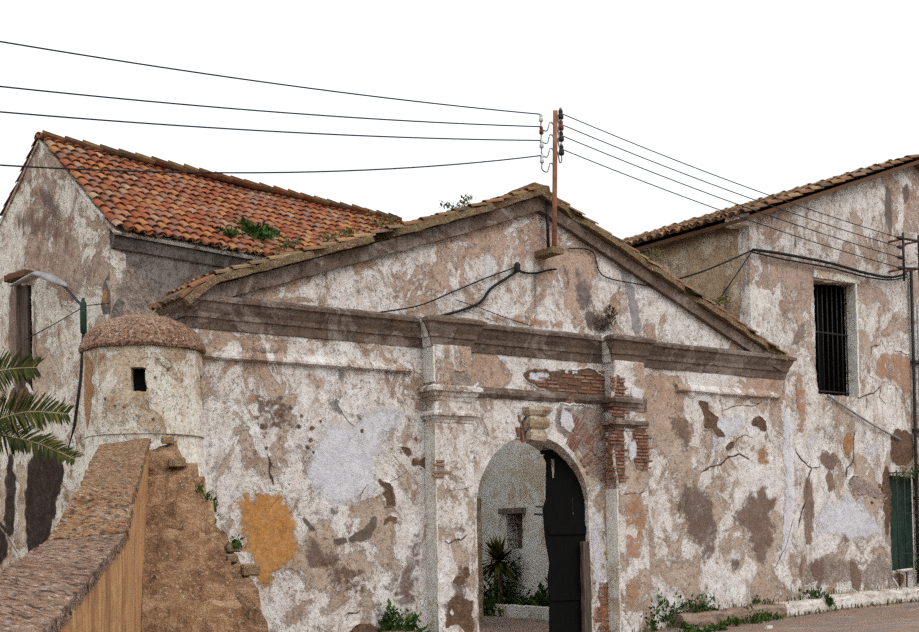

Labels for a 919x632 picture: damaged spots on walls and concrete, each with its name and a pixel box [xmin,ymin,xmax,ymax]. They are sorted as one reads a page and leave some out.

peeling [247,389,402,525]
spalling [397,437,451,477]
flaking render [523,366,654,486]
crack [702,434,752,472]
spalling [697,399,768,452]
peeling [781,366,914,560]
peeling [233,488,304,599]
flaking render [592,512,610,632]
leakage [678,480,719,559]
leakage [734,487,778,563]
crack [775,501,810,568]